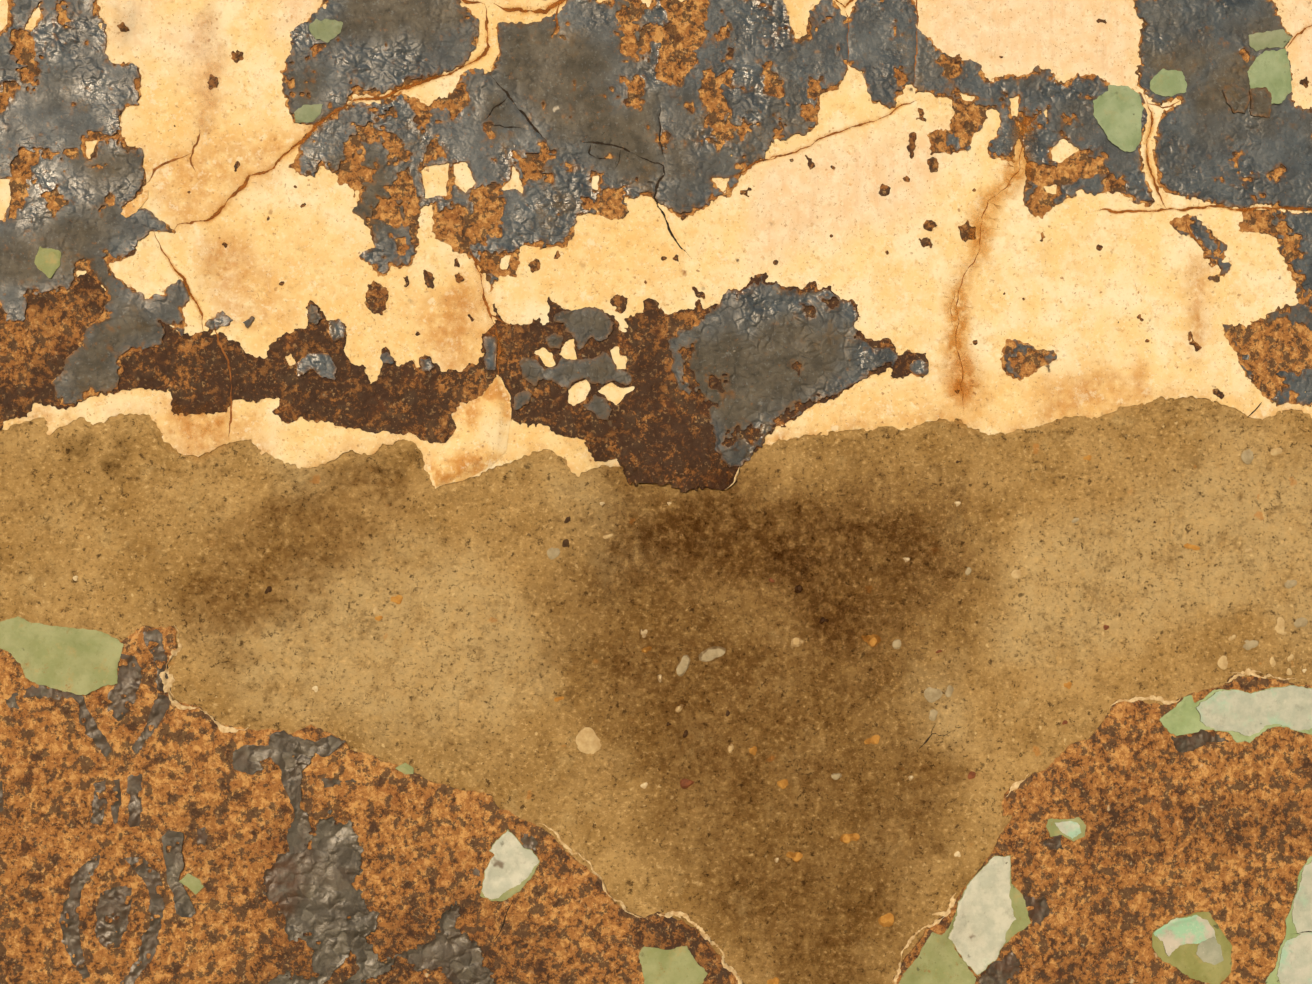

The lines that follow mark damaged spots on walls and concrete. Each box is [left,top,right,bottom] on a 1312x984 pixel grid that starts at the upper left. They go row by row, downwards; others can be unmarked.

peeling [0,0,190,406]
crack [147,0,565,437]
rust [0,272,929,493]
crack [579,101,692,259]
peeling [280,0,1312,407]
crack [740,0,919,173]
crack [950,111,1042,410]
crack [1099,94,1312,248]
spalling [0,276,1312,984]
rust [0,626,738,984]
rust [893,674,1312,984]